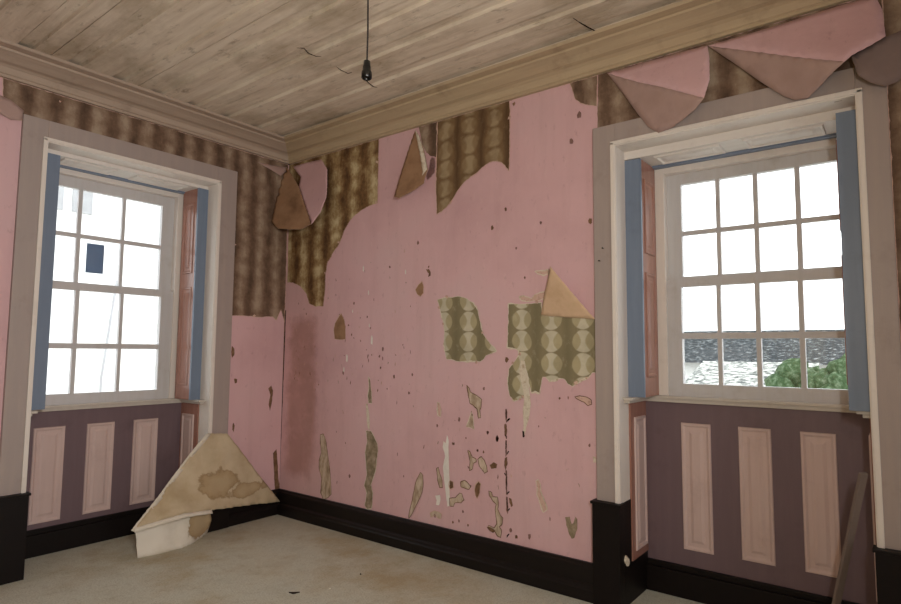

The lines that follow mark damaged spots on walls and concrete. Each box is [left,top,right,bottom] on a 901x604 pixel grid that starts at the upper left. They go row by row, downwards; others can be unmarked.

peeling [558,0,858,128]
peeling [878,0,901,37]
peeling [1,77,379,322]
peeling [419,100,515,215]
peeling [887,79,901,344]
peeling [437,295,596,402]